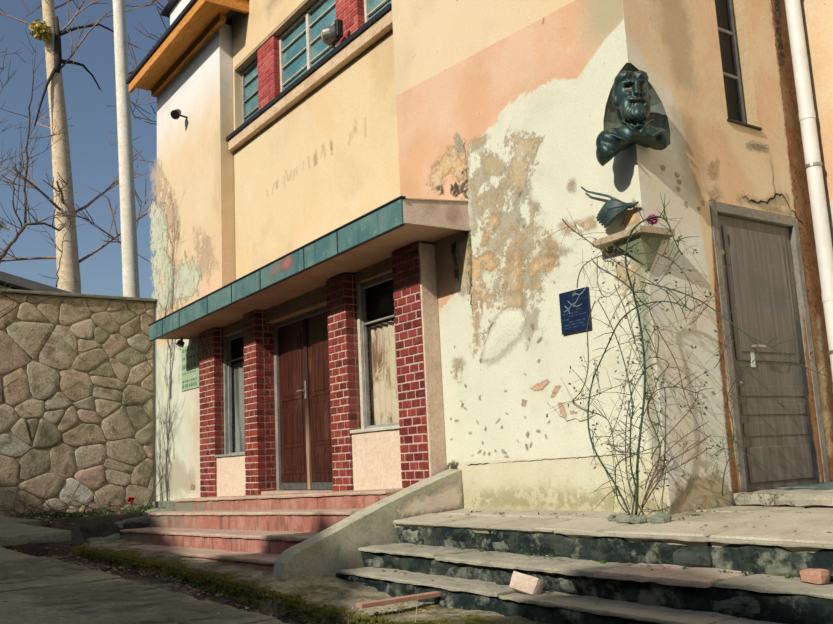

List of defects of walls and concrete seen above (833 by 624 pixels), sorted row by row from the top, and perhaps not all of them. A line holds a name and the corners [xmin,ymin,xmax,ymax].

flaking render [149,165,214,318]
flaking render [429,131,567,356]
flaking render [559,217,595,233]
crack [741,163,804,225]